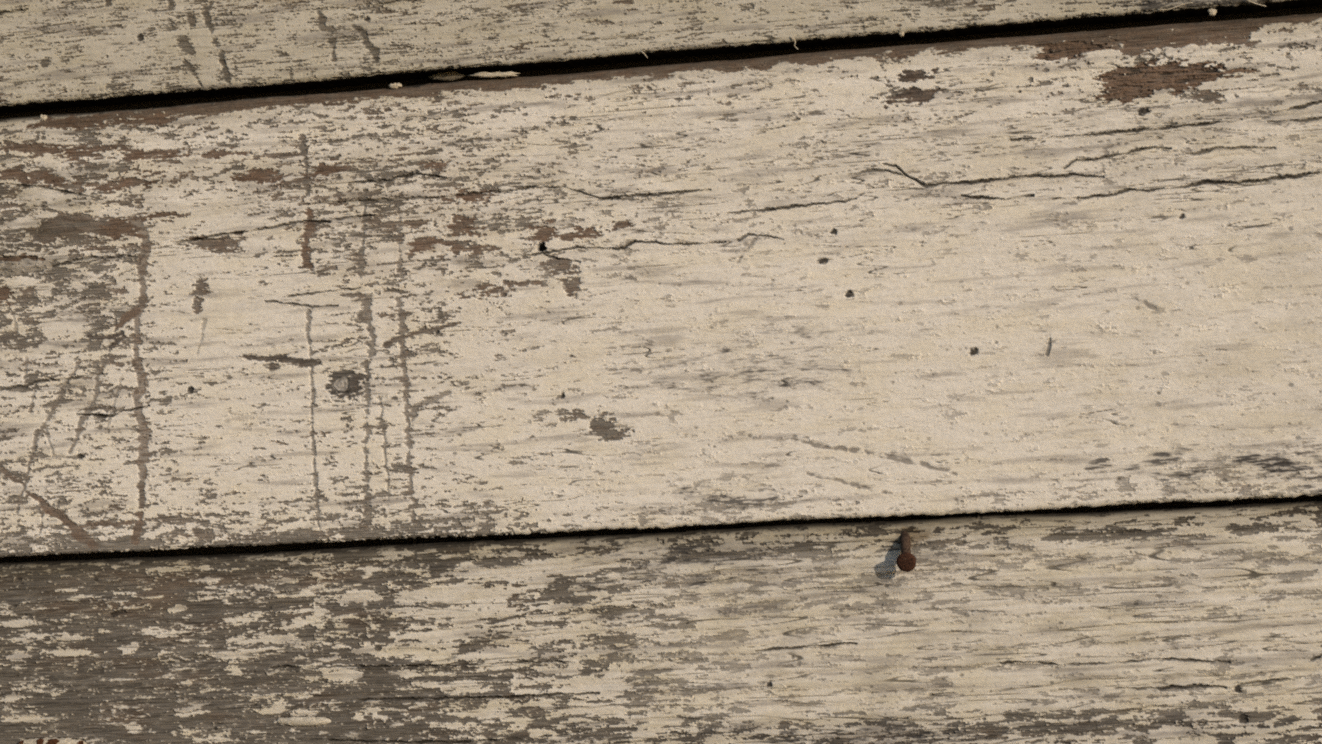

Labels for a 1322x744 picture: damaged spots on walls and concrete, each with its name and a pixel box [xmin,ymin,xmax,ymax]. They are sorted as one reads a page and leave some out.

peeling [0,0,1322,277]
crack [47,100,1322,269]
peeling [0,187,719,744]
spalling [1237,712,1251,724]